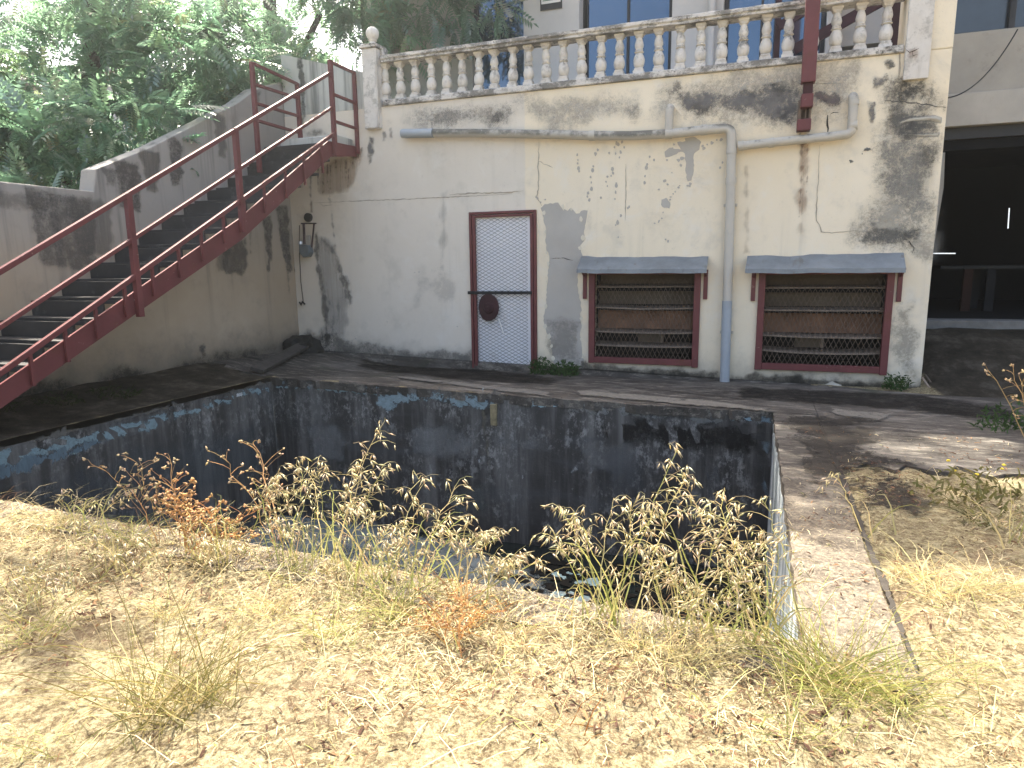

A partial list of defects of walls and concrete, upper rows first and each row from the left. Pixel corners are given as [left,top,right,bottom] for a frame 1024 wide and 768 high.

water stain [112,138,184,212]
water stain [214,113,226,155]
crack [319,148,553,206]
peeling [643,137,723,224]
crack [816,83,869,233]
water stain [849,60,933,255]
water stain [26,188,96,270]
water stain [263,207,292,271]
peeling [535,141,625,369]
water stain [309,234,553,384]
peeling [0,376,559,479]
water stain [622,419,768,452]